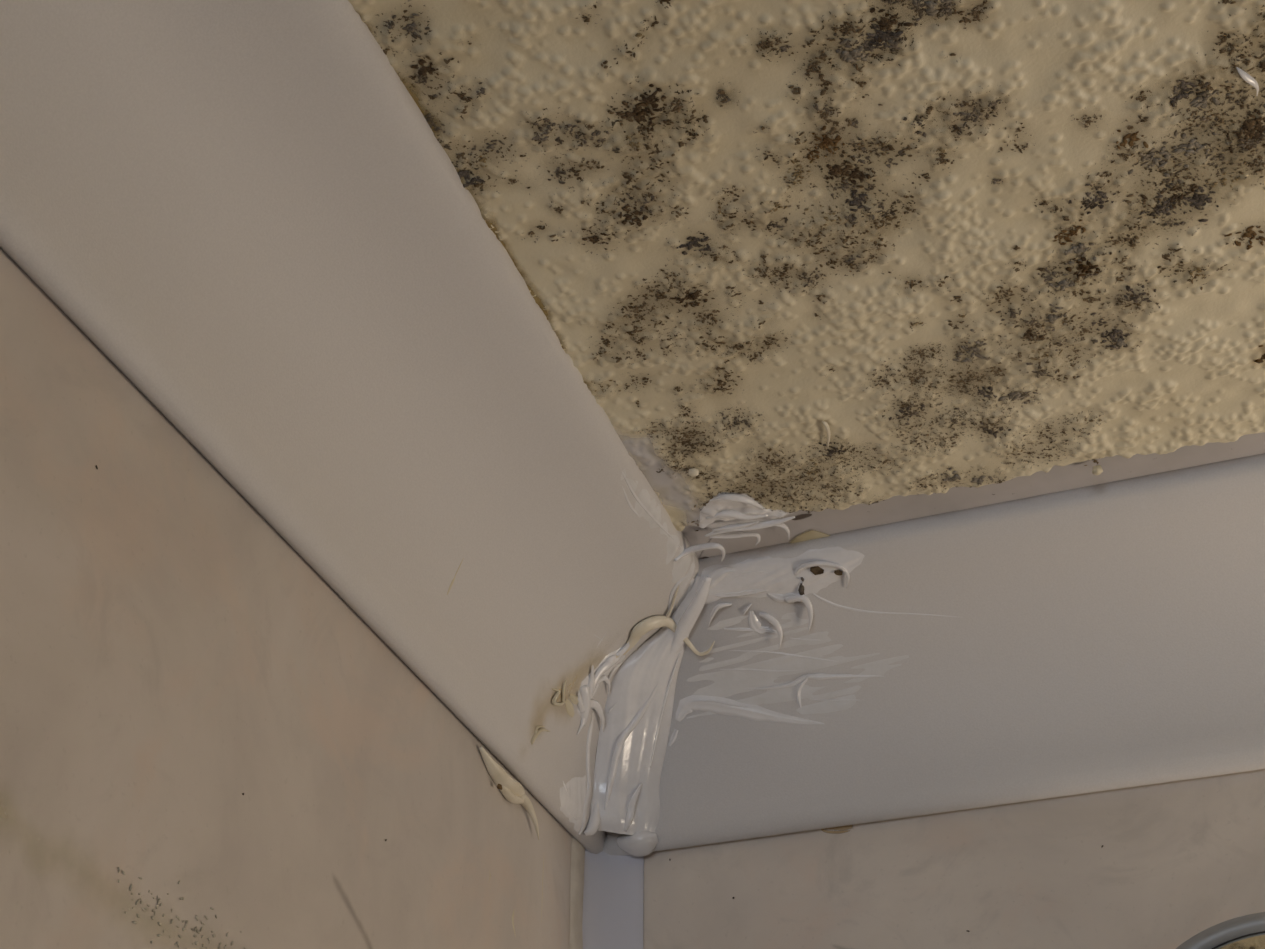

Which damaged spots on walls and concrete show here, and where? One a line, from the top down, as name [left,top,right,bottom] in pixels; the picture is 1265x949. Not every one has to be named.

leakage [368,3,739,256]
leakage [482,217,565,349]
leakage [584,0,1265,531]
peeling [623,586,715,656]